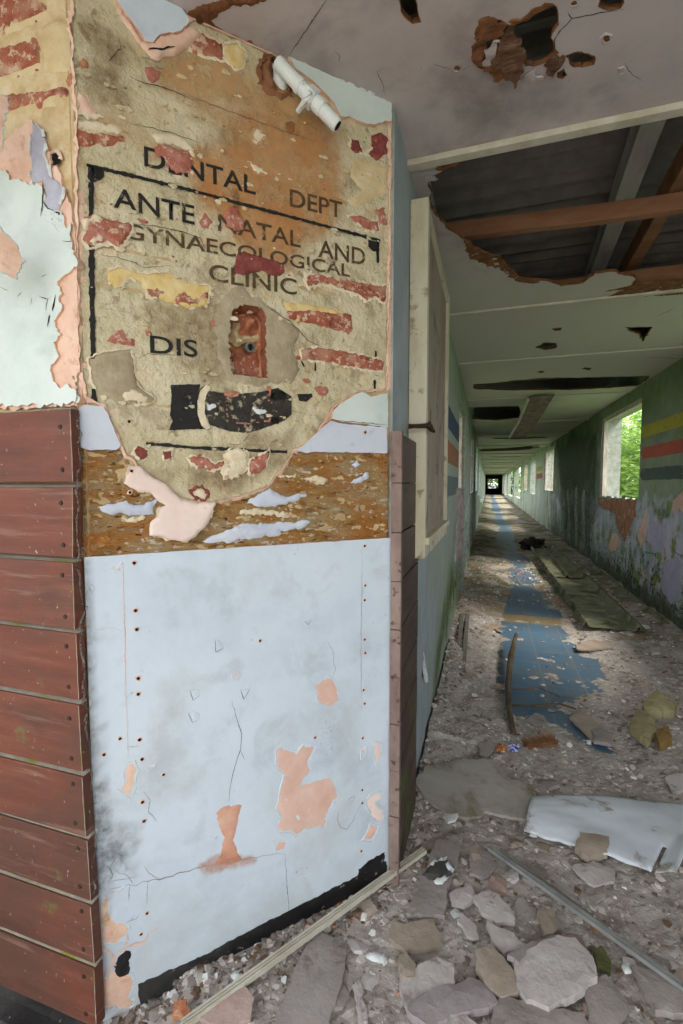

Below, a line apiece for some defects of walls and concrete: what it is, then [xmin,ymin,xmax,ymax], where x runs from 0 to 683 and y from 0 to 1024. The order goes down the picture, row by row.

spalling [450,0,596,89]
spalling [0,0,393,543]
spalling [598,495,649,580]
peeling [314,675,341,707]
peeling [117,757,145,805]
peeling [207,804,251,870]
peeling [272,735,340,854]
peeling [358,788,385,886]
crack [105,853,290,911]
peeling [100,885,158,1011]